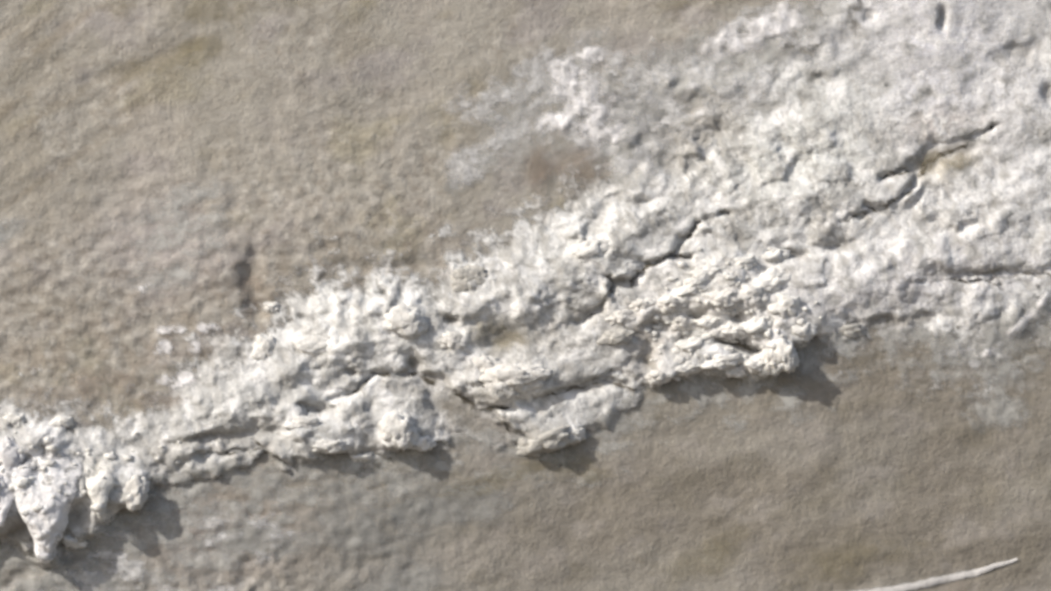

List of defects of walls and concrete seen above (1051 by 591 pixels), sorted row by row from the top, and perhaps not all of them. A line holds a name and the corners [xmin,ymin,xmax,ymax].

damp [447,147,499,188]
crack [840,126,994,222]
damp [429,224,455,237]
damp [157,340,172,353]
damp [184,333,199,353]
damp [197,323,217,332]
damp [780,387,802,408]
damp [976,377,1022,426]
damp [93,487,322,570]
damp [318,476,501,555]
damp [73,560,145,591]